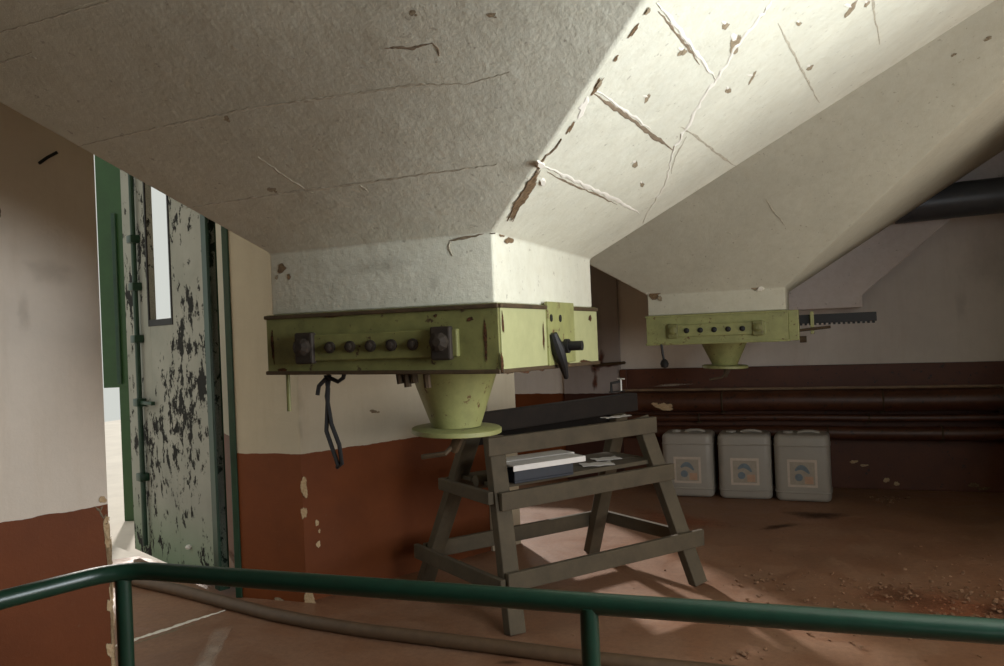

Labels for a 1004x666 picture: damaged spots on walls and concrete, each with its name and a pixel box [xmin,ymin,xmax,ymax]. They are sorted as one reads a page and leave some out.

crack [872,0,880,45]
spalling [507,78,604,222]
crack [545,0,820,223]
peeling [300,477,320,548]